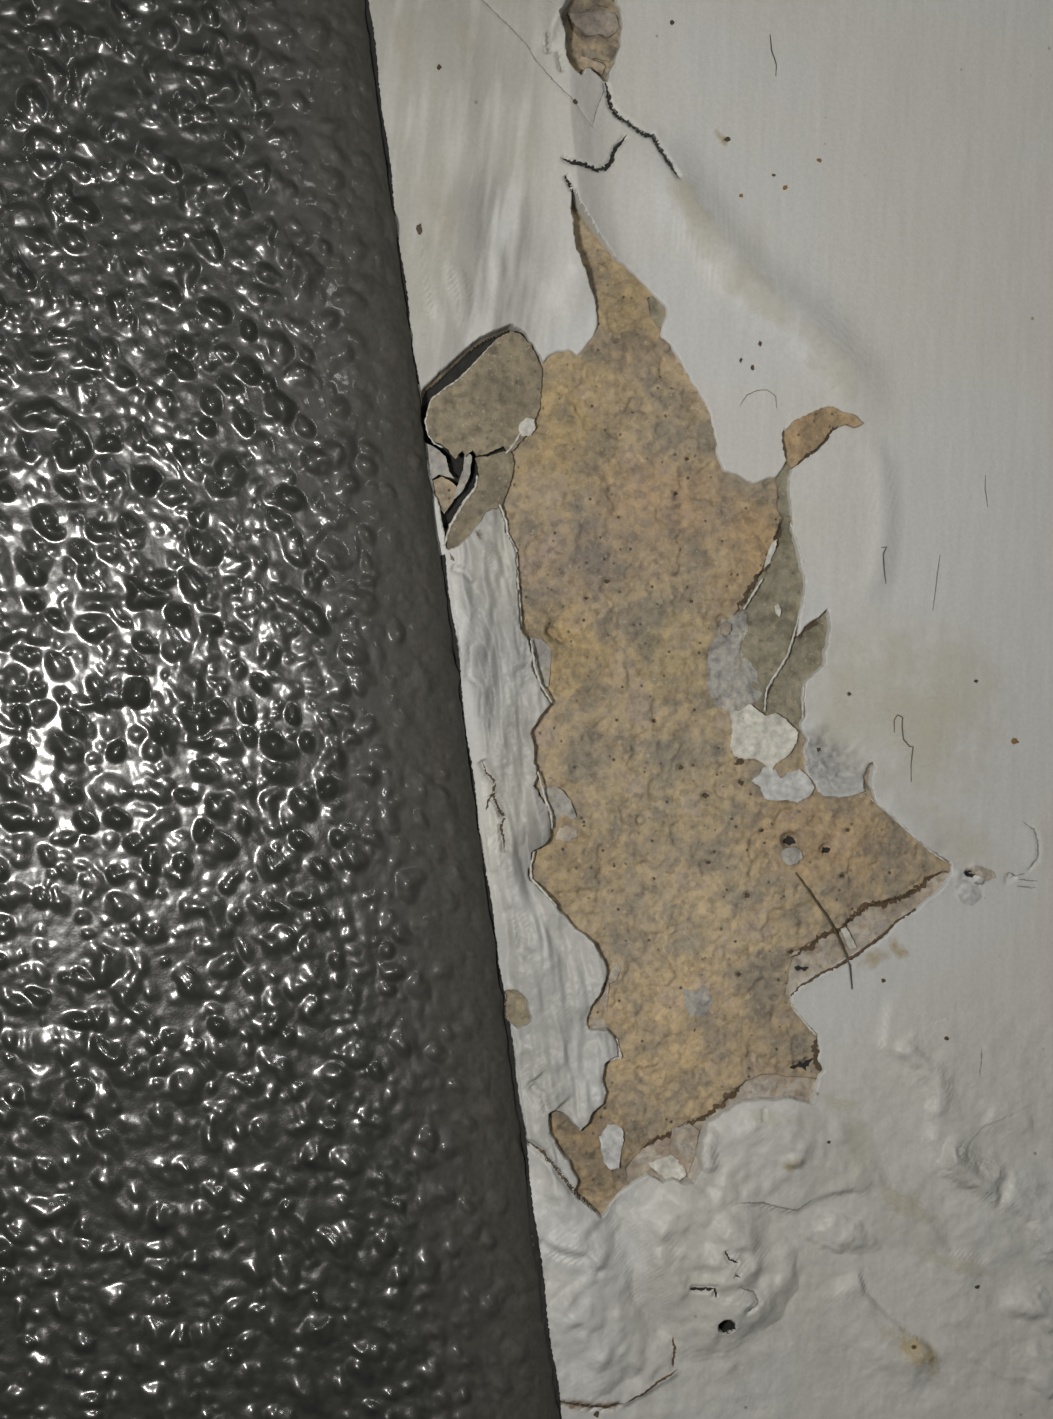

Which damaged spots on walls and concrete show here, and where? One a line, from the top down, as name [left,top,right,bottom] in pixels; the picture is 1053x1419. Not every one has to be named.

crack [481,0,681,192]
peeling [561,0,621,81]
peeling [421,201,996,1215]